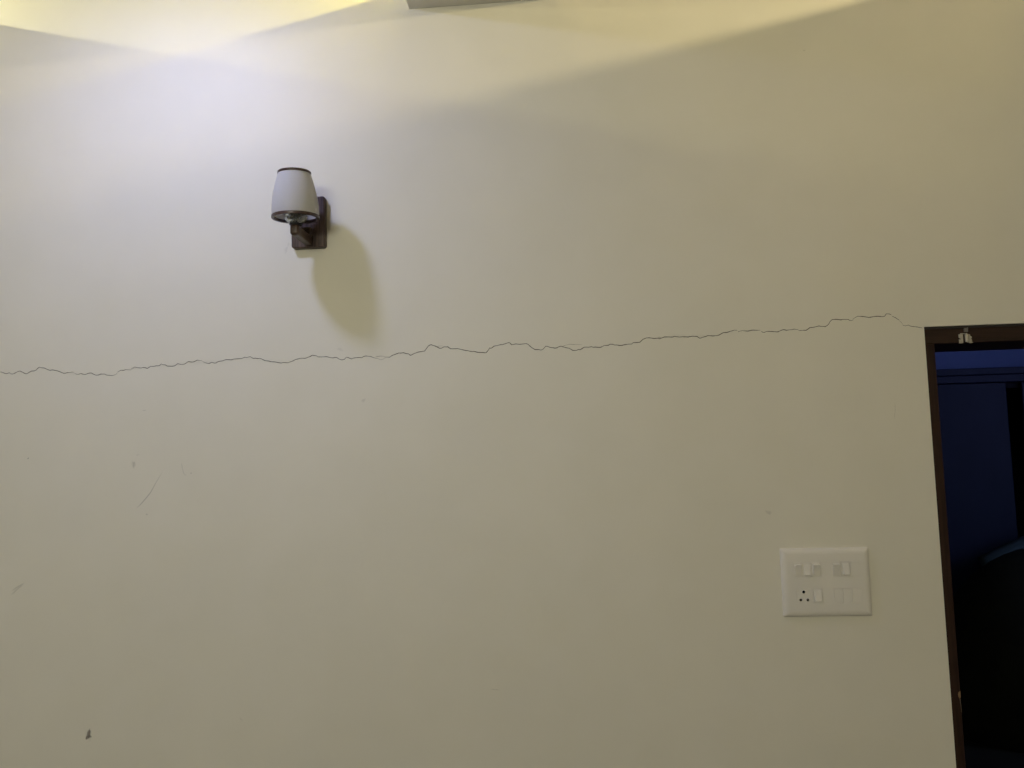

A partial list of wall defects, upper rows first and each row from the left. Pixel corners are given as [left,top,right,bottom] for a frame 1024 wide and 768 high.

crack [2,314,921,376]